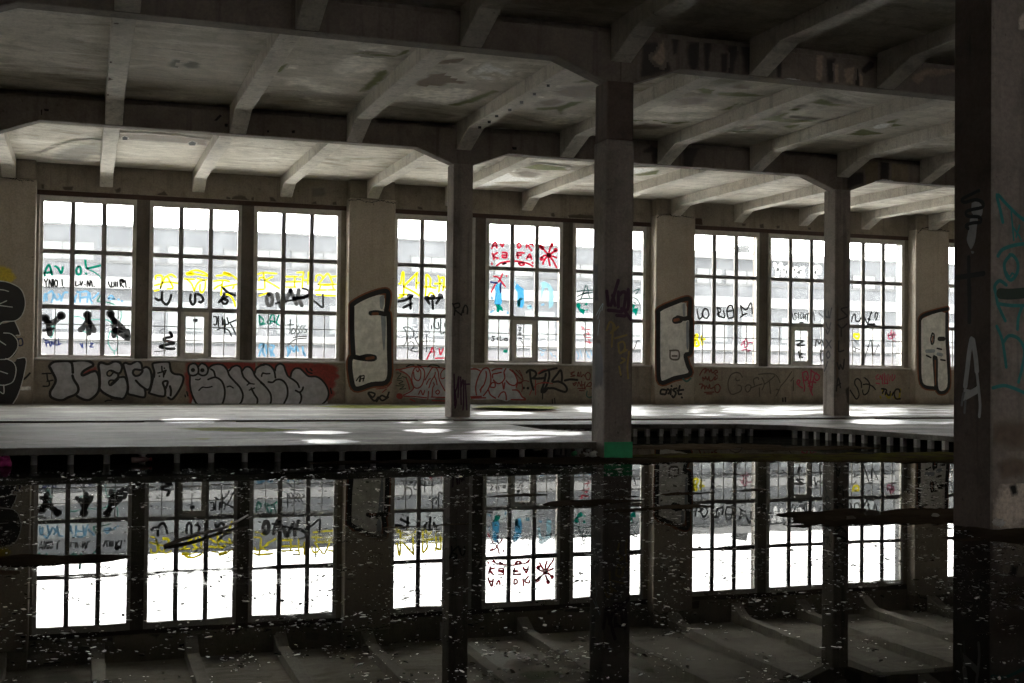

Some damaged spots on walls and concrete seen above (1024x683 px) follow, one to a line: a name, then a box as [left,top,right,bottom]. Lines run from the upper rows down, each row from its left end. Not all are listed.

damp [271,42,405,110]
damp [397,56,534,108]